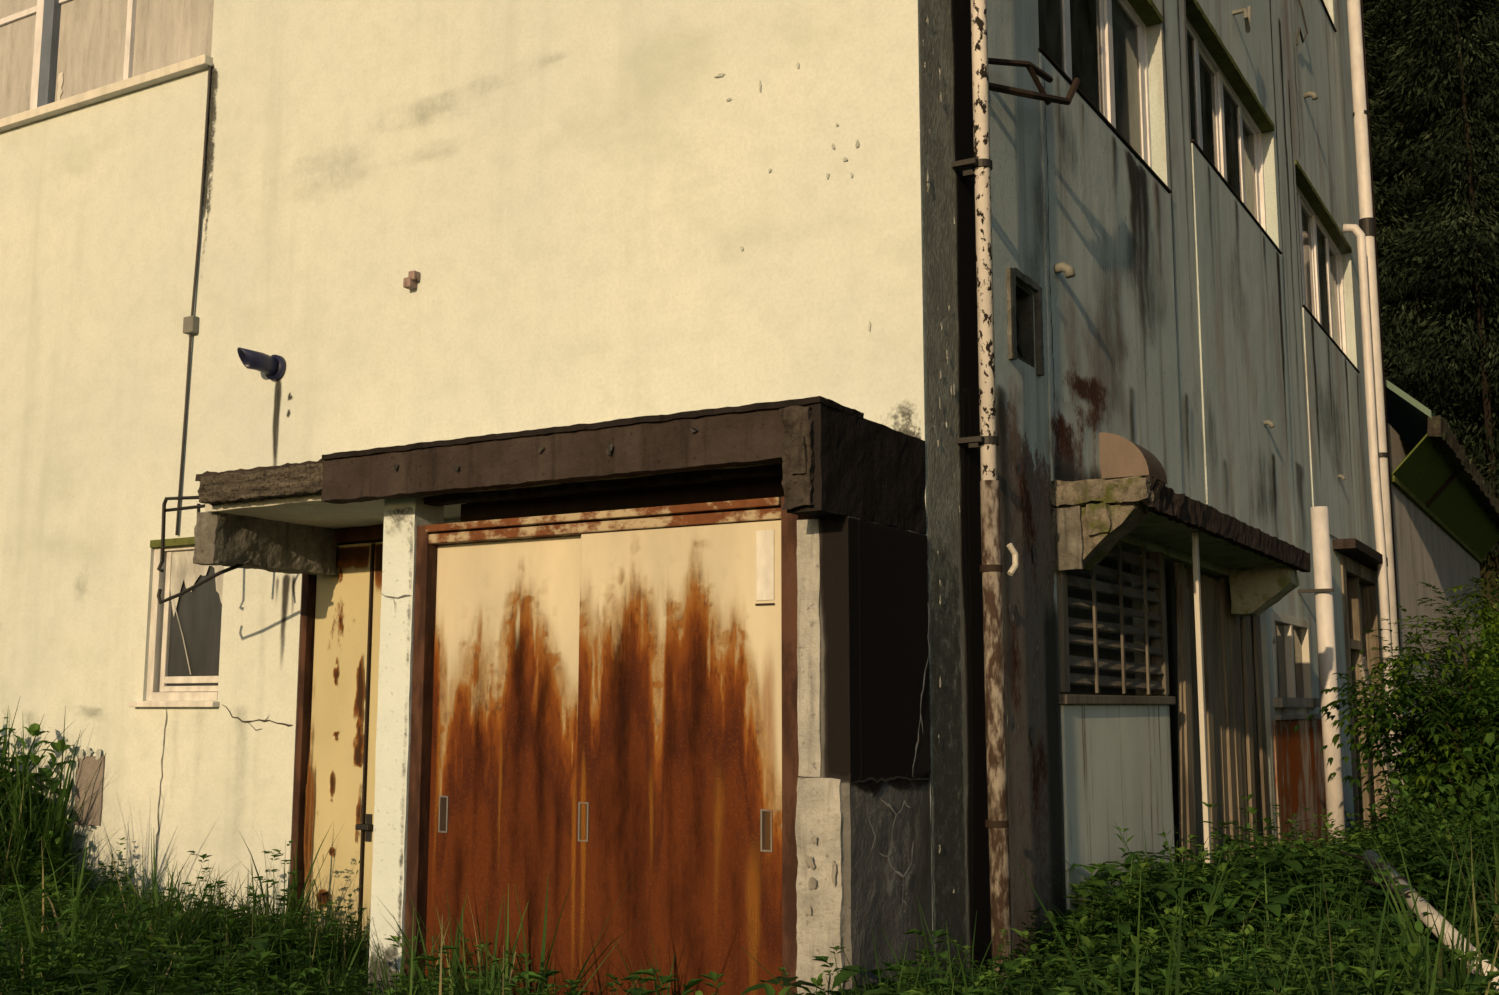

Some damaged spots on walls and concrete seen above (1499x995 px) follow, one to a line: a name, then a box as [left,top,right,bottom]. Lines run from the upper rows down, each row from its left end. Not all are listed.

water stain [1113,0,1211,361]
water stain [1263,0,1361,455]
water stain [273,380,292,466]
rust [1051,371,1106,476]
water stain [1055,458,1106,481]
rust [336,544,383,589]
crack [223,705,292,731]
rust [304,726,335,921]
rust [333,655,365,843]
rust [425,571,783,995]
crack [853,538,935,956]
rust [1283,708,1315,817]